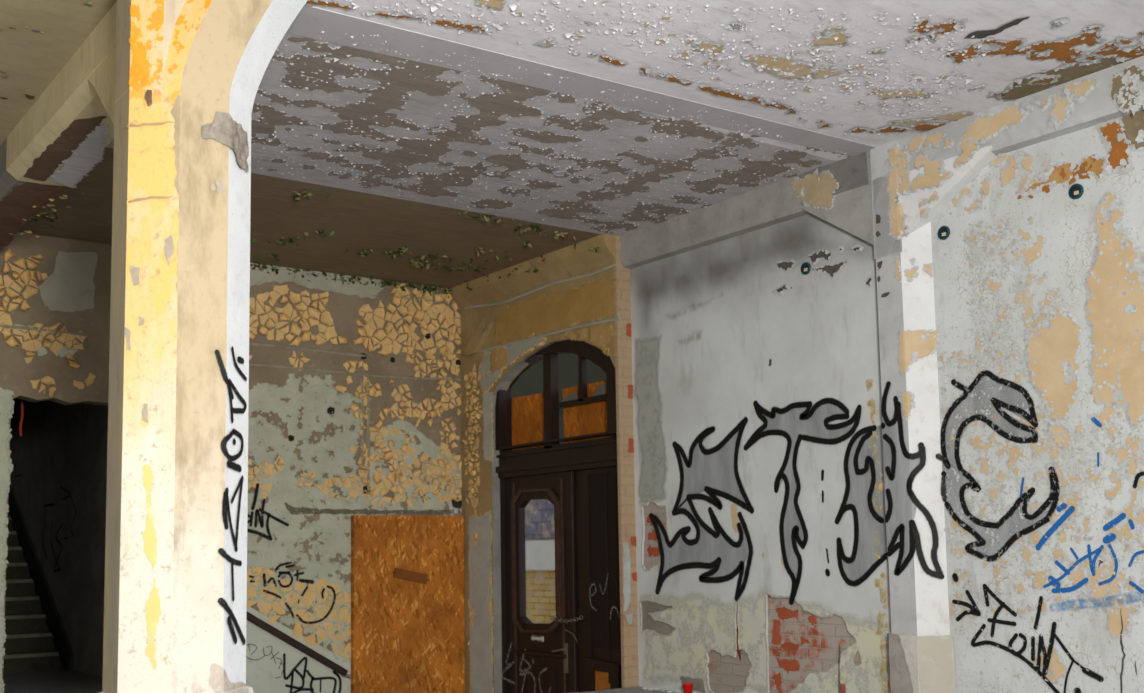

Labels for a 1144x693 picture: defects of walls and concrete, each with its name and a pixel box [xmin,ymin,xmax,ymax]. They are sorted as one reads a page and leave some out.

peeling [8,123,110,238]
peeling [30,376,56,398]
peeling [0,249,97,389]
peeling [124,316,145,350]
peeling [130,265,140,285]
peeling [140,403,150,426]
peeling [164,31,862,693]
peeling [345,0,1144,639]
peeling [0,388,15,693]
peeling [142,464,161,669]
peeling [874,531,954,693]
peeling [1028,646,1067,685]